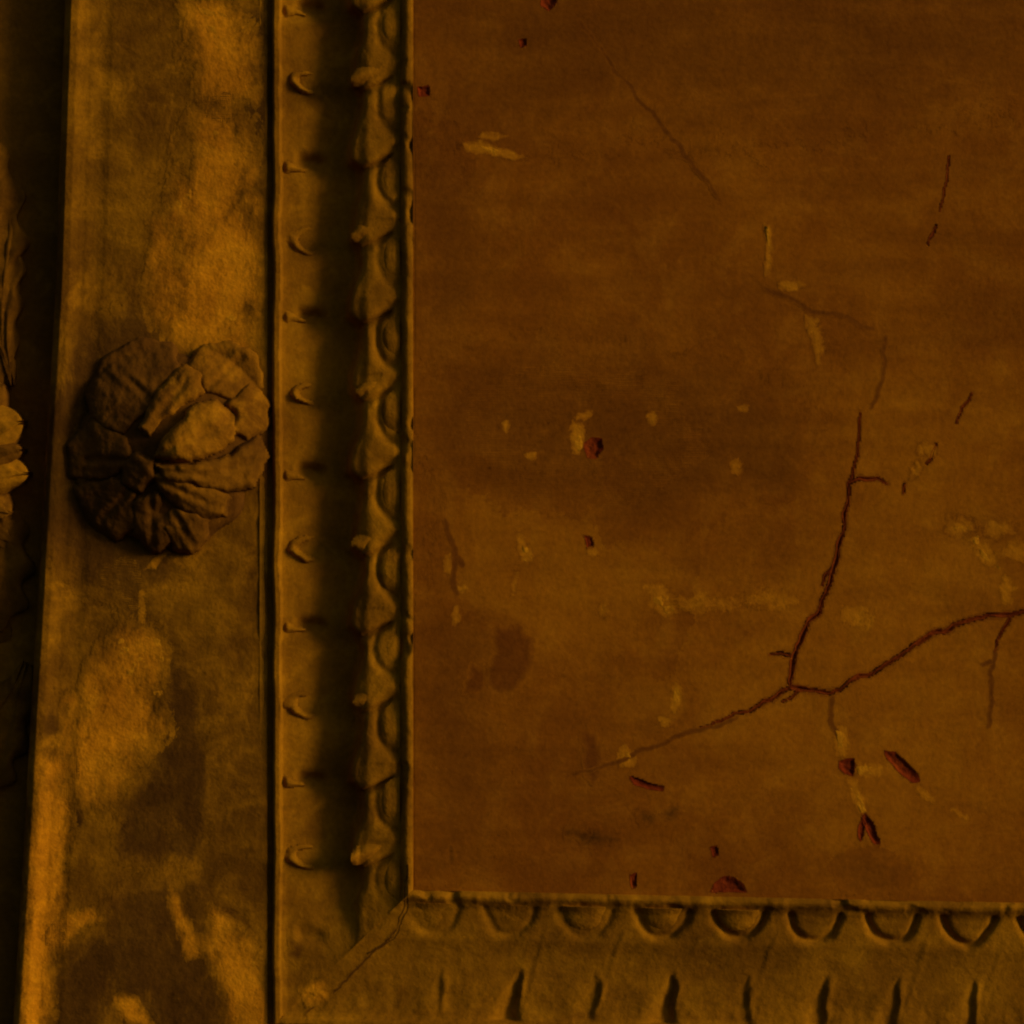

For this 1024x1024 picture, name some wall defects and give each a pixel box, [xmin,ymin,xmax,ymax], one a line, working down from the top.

peeling [463,131,528,161]
crack [927,156,950,245]
peeling [569,410,604,459]
leakage [415,0,1024,901]
crack [565,286,1024,777]
spalling [833,724,937,848]